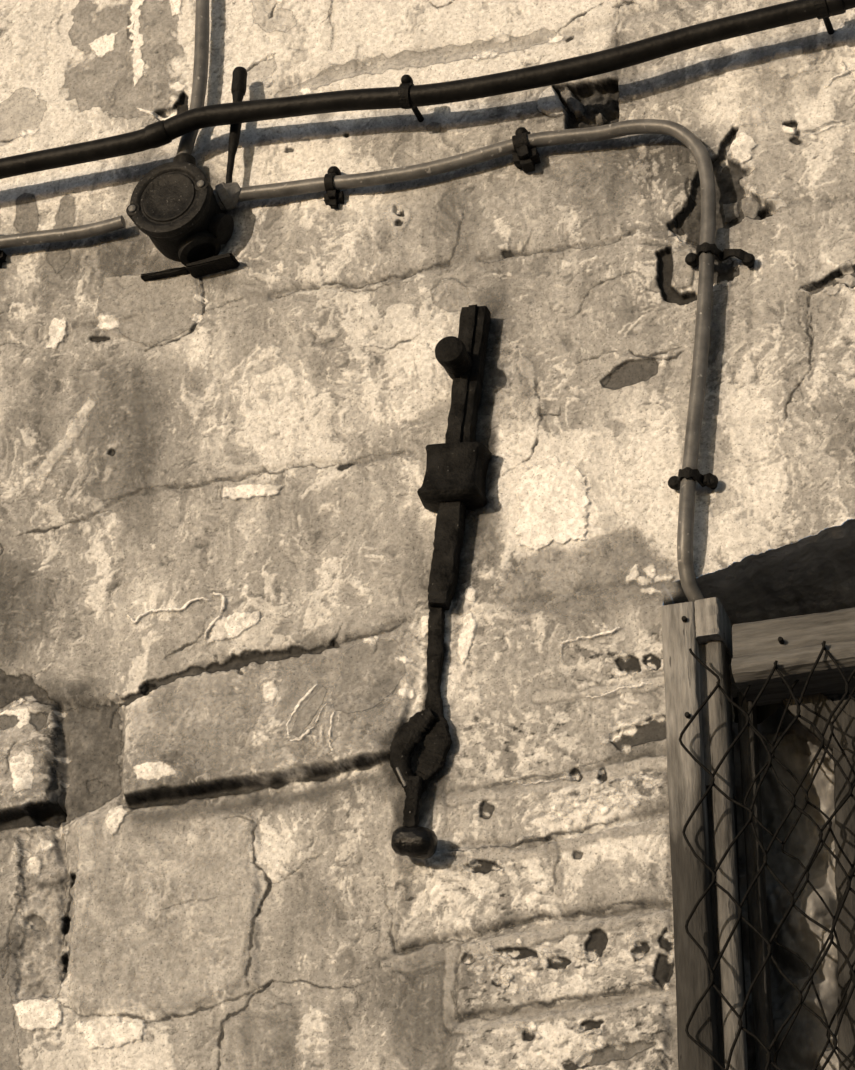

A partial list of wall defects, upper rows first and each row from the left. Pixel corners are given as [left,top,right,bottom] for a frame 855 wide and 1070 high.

spalling [537,80,620,129]
spalling [712,106,788,240]
spalling [656,173,701,305]
spalling [600,352,682,390]
crack [785,306,814,418]
crack [0,451,405,555]
crack [120,613,404,707]
spalling [0,669,127,1070]
crack [61,753,390,1070]
spalling [461,928,608,993]
spalling [626,927,674,990]
peeling [75,1016,145,1050]